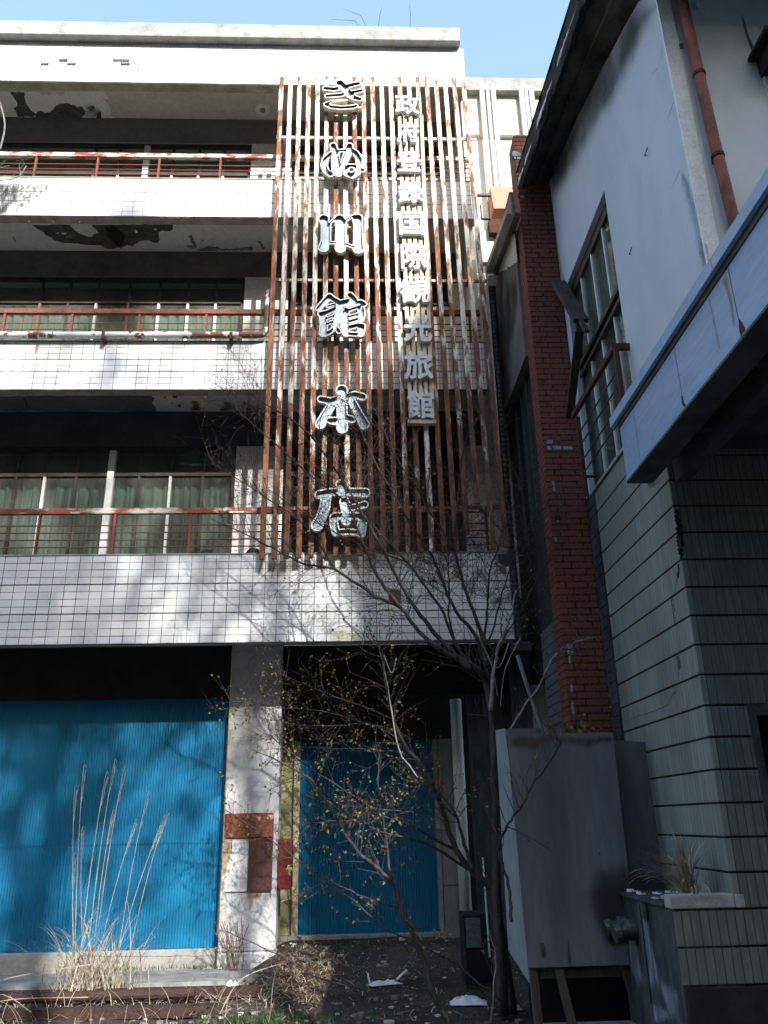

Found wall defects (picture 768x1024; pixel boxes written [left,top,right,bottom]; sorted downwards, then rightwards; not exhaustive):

peeling [0,91,115,118]
spalling [32,224,173,249]
corrosion [221,842,232,872]